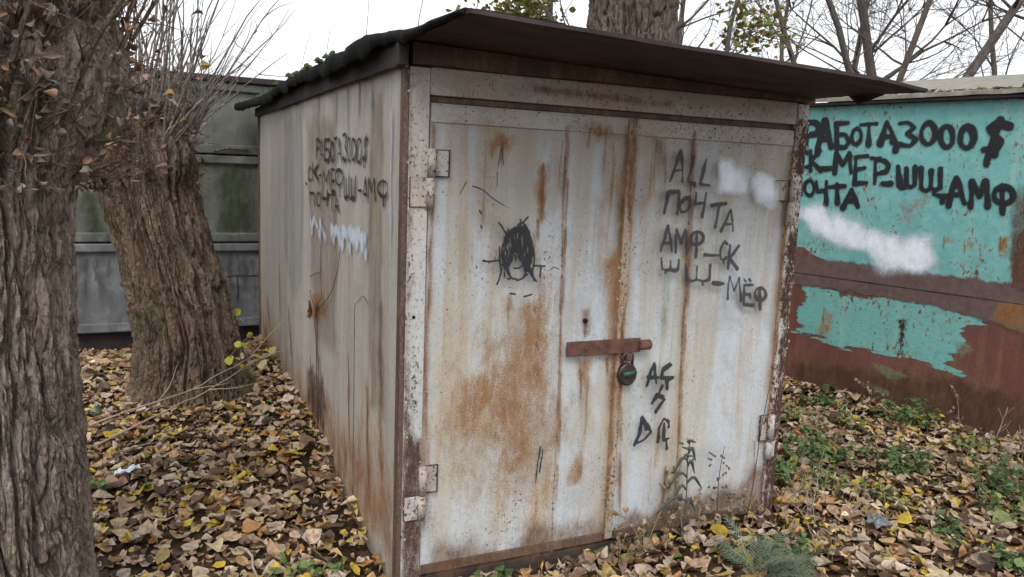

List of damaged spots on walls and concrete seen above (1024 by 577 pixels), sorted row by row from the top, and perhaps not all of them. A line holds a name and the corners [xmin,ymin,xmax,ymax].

rust [263,294,392,573]
rust [450,280,565,471]
rust [537,132,569,237]
rust [557,458,583,483]
rust [588,116,637,339]
rust [678,134,696,439]
rust [770,315,779,381]
peeling [762,230,985,518]
rust [777,151,1024,335]
rust [791,361,1024,441]